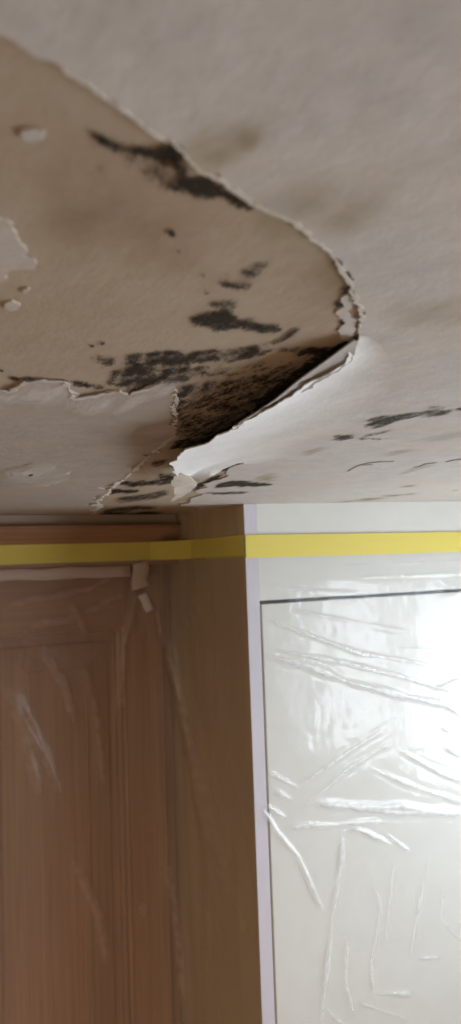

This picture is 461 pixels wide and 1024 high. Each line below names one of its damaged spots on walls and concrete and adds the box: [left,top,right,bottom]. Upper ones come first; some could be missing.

water stain [92,132,254,212]
peeling [0,36,393,515]
water stain [0,261,357,450]
water stain [331,406,461,441]
water stain [102,460,174,515]
water stain [194,475,272,495]